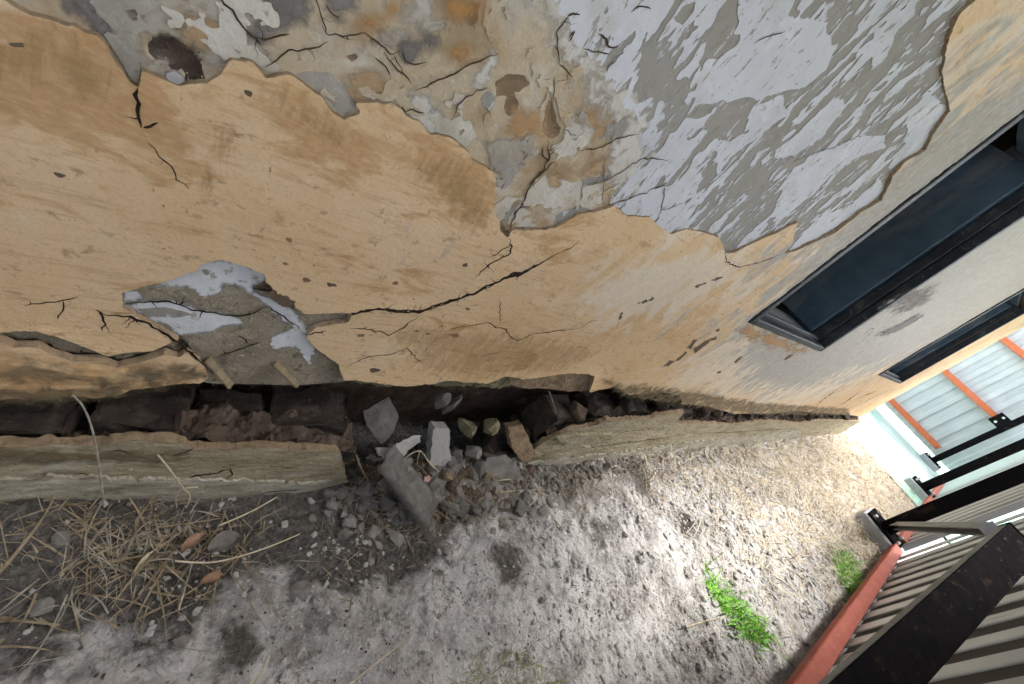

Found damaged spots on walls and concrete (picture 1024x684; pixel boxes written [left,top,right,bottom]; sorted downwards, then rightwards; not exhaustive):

crack [553,12,625,102]
crack [126,88,198,189]
peeling [13,0,968,251]
crack [345,129,683,368]
flaking render [4,331,153,359]
flaking render [123,260,394,387]
crack [593,386,795,448]